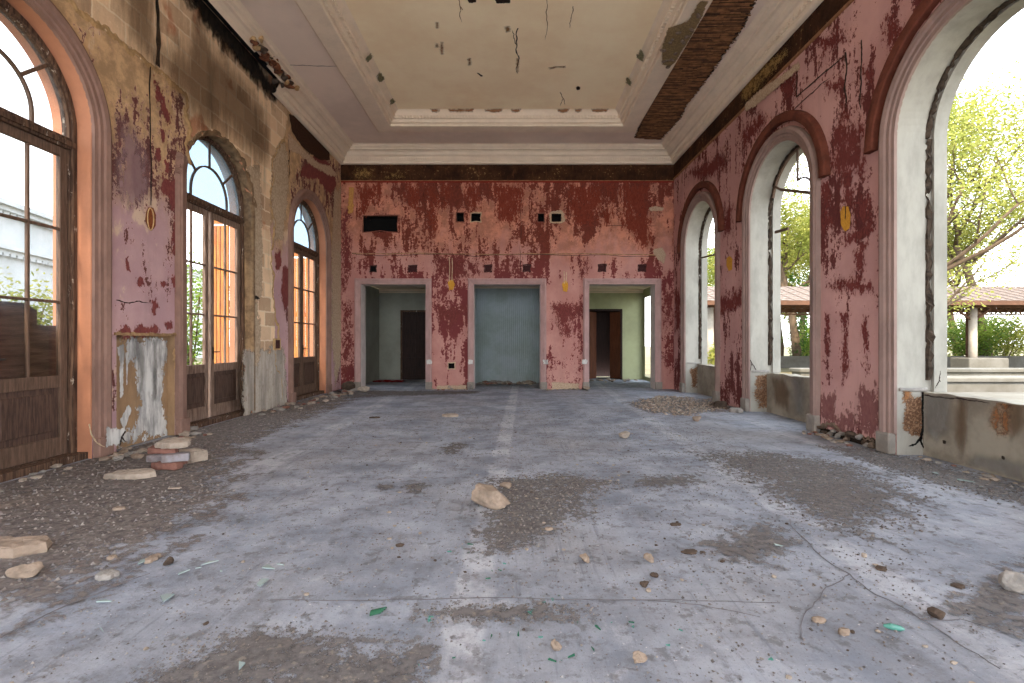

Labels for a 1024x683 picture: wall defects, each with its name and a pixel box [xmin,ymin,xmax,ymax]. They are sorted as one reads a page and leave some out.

crack [512,28,520,72]
peeling [819,24,850,61]
peeling [880,5,905,53]
peeling [738,45,800,152]
spalling [66,0,666,416]
peeling [689,143,729,181]
peeling [821,62,877,297]
peeling [661,287,680,376]
peeling [720,285,742,319]
peeling [817,311,878,449]
crack [790,521,1000,669]